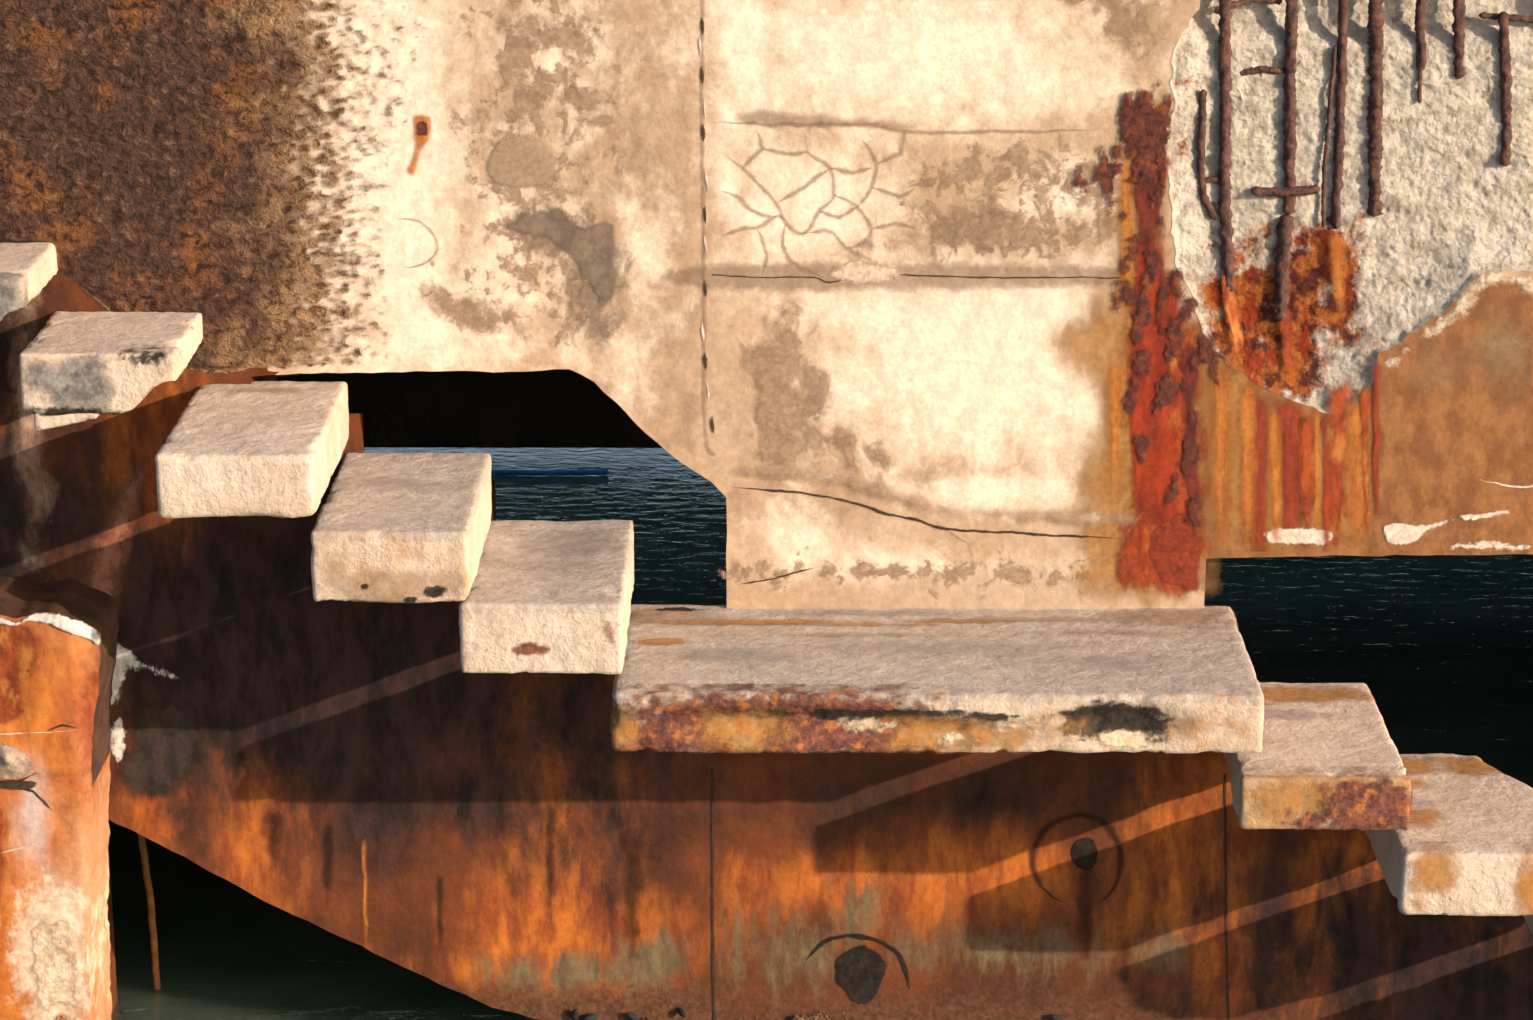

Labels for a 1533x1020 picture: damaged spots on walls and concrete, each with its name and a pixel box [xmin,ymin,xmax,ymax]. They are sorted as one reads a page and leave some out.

corrosion [409,116,430,174]
crack [699,17,1169,433]
spalling [1165,0,1533,414]
corrosion [631,80,1381,645]
crack [735,487,1108,538]
crack [739,568,812,585]
corrosion [0,621,37,734]
corrosion [513,642,550,655]
crack [0,724,77,735]
corrosion [701,710,789,753]
crack [20,772,52,810]
corrosion [1283,757,1500,908]